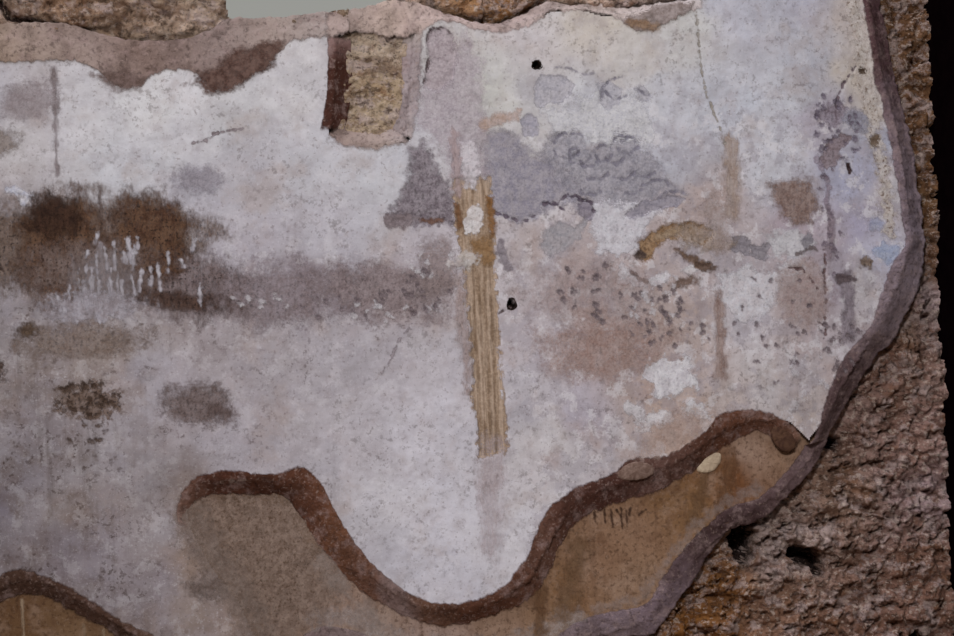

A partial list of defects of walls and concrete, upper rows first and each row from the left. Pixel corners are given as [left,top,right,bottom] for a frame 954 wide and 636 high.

damp [4,68,59,151]
damp [0,130,17,154]
damp [180,167,224,193]
damp [0,184,471,393]
damp [497,238,513,271]
spalling [557,261,608,325]
spalling [619,221,770,348]
flaking render [795,230,842,259]
spalling [53,378,123,444]
peeling [176,494,345,636]
spalling [725,525,753,564]
spalling [786,545,822,576]